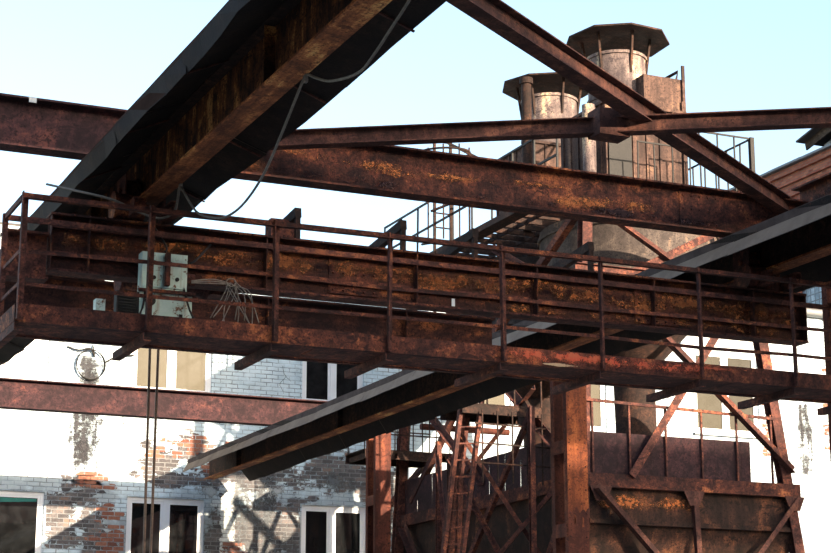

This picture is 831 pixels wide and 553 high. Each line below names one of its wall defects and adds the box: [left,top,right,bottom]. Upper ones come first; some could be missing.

corrosion [527,198,650,218]
corrosion [142,243,245,266]
corrosion [330,262,599,303]
corrosion [612,292,791,335]
water stain [78,356,101,384]
water stain [67,414,103,470]
corrosion [566,386,589,527]
water stain [797,404,815,485]
peeling [44,471,125,553]
peeling [128,429,366,553]
corrosion [601,494,643,509]
corrosion [659,498,692,510]